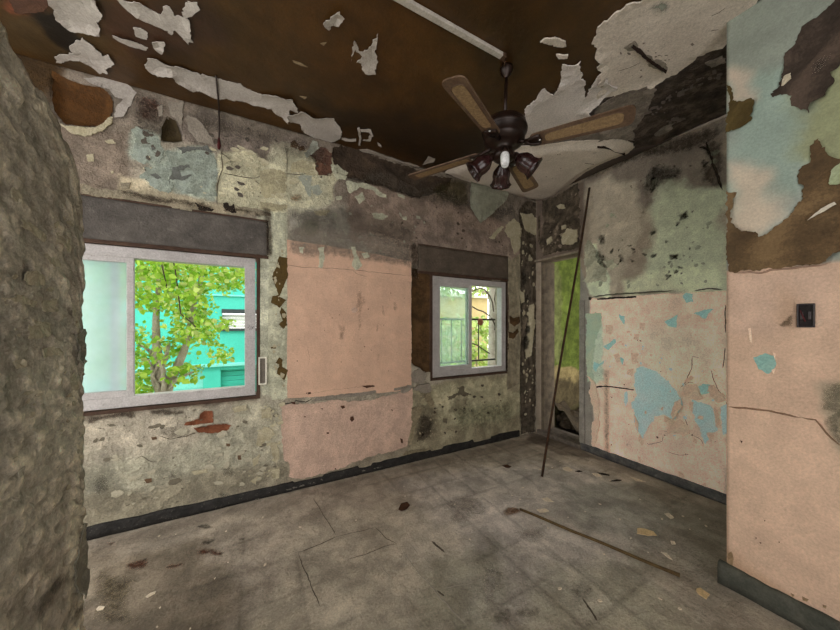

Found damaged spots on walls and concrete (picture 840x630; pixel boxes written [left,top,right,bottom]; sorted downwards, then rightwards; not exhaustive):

flaking render [523,0,758,149]
peeling [771,0,840,113]
water stain [123,191,210,208]
flaking render [9,0,452,270]
water stain [224,208,272,255]
water stain [291,226,418,277]
flaking render [456,178,619,434]
crack [590,290,671,298]
water stain [645,167,680,192]
water stain [644,128,721,186]
peeling [725,139,840,273]
crack [681,288,840,445]